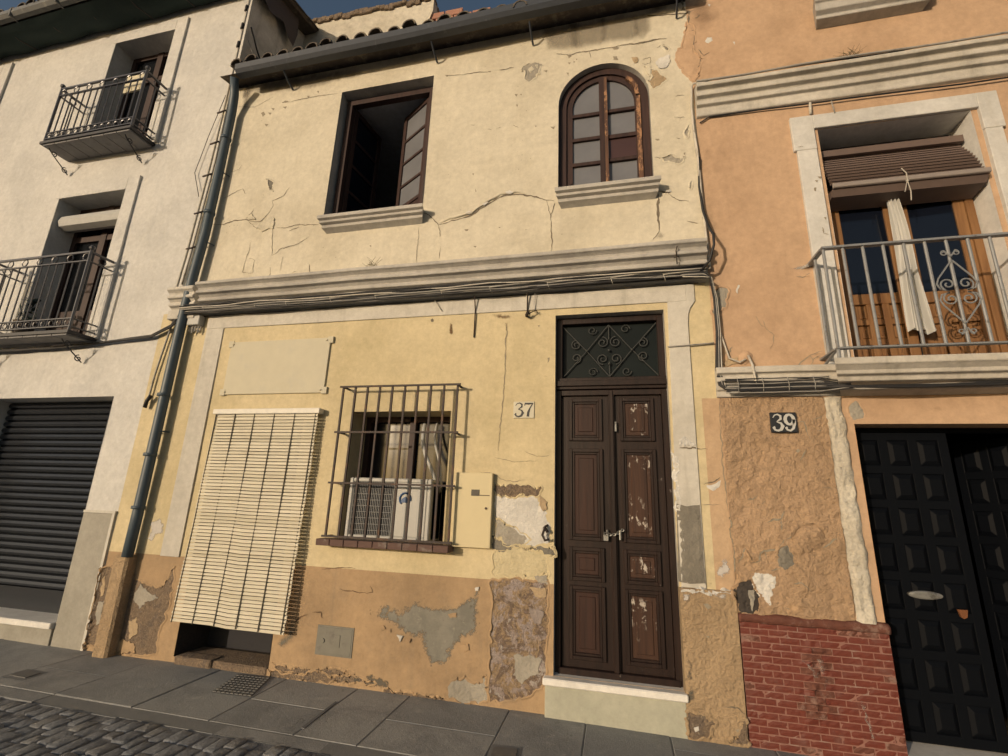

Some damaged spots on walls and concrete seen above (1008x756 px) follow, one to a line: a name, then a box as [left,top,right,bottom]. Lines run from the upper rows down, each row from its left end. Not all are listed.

flaking render [631,22,712,90]
crack [213,165,318,272]
crack [416,190,555,263]
peeling [671,436,706,584]
peeling [117,565,176,657]
peeling [377,575,552,705]
flaking render [730,572,776,614]